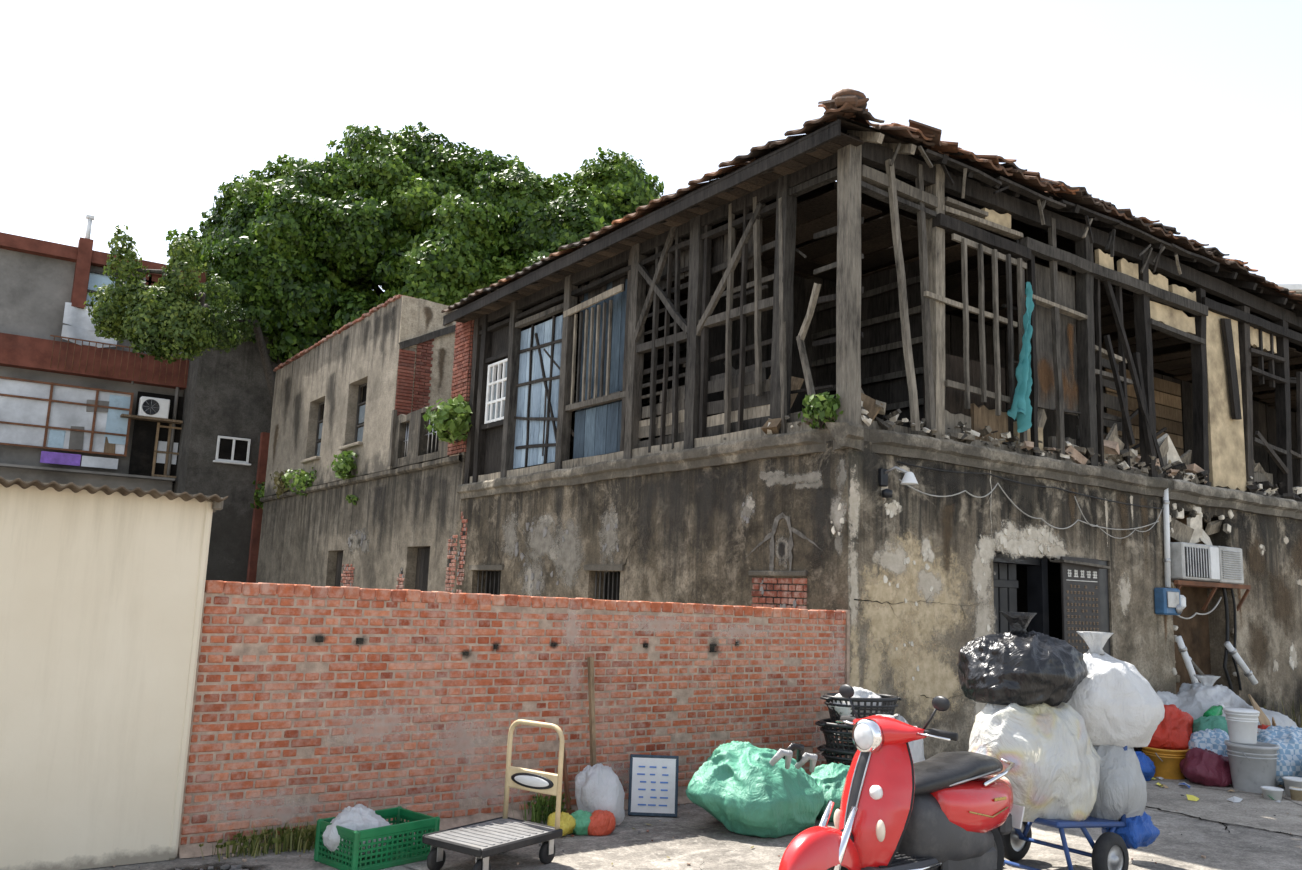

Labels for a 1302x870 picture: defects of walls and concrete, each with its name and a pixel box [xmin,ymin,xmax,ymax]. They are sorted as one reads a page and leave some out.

leakage [328,307,395,419]
leakage [273,378,301,459]
flaking render [740,494,755,523]
flaking render [751,459,1068,722]
crack [854,598,975,622]